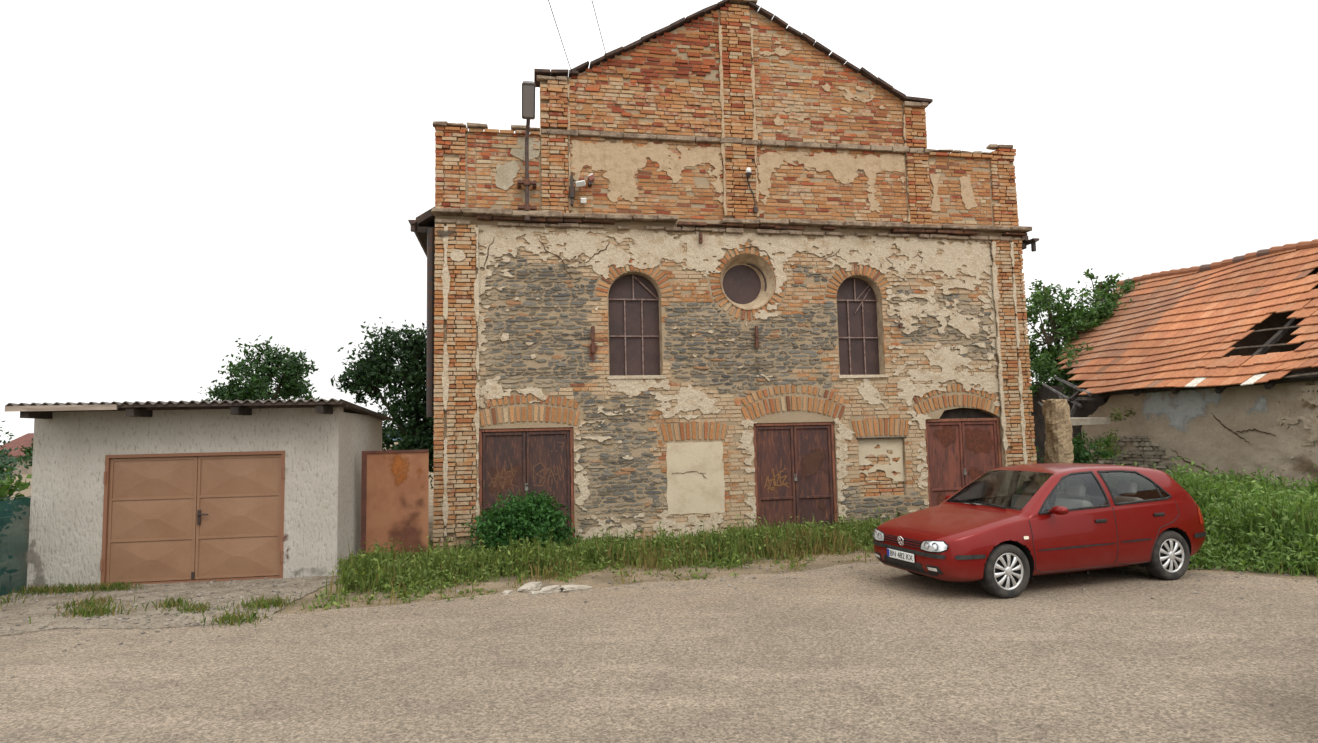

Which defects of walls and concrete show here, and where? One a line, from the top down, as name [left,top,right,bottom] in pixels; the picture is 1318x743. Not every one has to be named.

peeling [754,40,801,66]
peeling [817,67,886,122]
peeling [570,140,724,203]
peeling [757,106,905,214]
spalling [791,263,828,287]
spalling [663,301,838,396]
spalling [885,276,996,365]
spalling [481,247,668,539]
peeling [1143,389,1220,431]
spalling [1084,436,1188,476]
corrosion [391,500,426,556]
spalling [841,487,926,523]